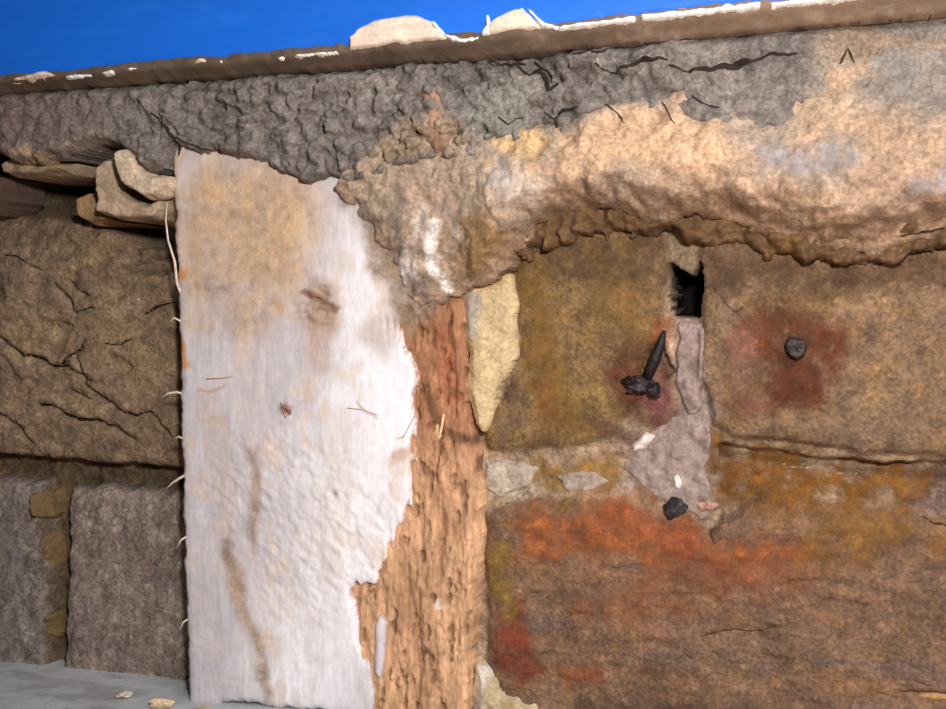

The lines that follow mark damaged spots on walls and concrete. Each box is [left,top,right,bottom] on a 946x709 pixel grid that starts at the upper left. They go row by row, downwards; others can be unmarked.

crack [4,254,93,313]
crack [145,302,175,314]
crack [0,336,172,439]
rust [608,343,671,428]
rust [518,499,813,584]